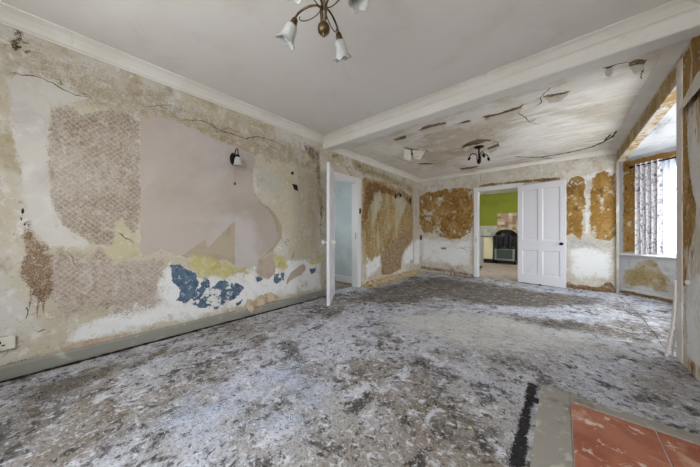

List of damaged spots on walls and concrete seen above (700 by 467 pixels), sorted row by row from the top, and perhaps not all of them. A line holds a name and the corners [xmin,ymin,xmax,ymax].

peeling [604,59,647,79]
crack [14,72,91,98]
peeling [535,88,570,107]
crack [134,98,281,149]
peeling [418,120,471,134]
peeling [483,104,539,125]
peeling [462,139,499,153]
crack [500,131,617,168]
flaking render [567,168,614,186]
flaking render [43,253,322,355]